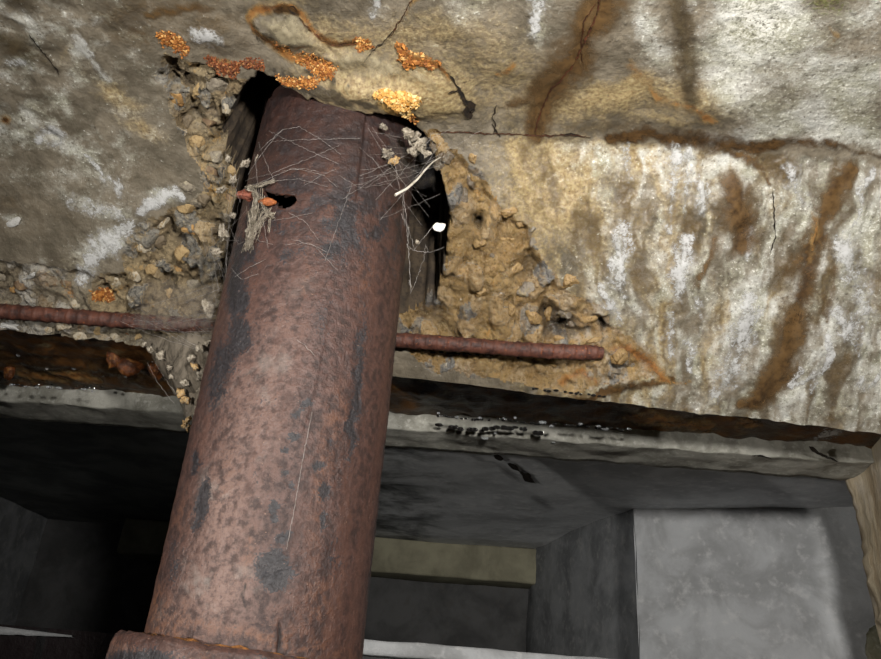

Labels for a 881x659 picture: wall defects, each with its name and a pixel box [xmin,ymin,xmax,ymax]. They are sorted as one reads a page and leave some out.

corrosion [245,2,375,91]
crack [367,0,416,58]
corrosion [394,41,450,80]
crack [436,0,600,138]
corrosion [372,88,422,125]
corrosion [236,189,277,206]
water stain [670,146,711,213]
spalling [395,129,654,396]
water stain [598,220,633,319]
water stain [670,235,694,297]
water stain [834,235,866,282]
water stain [788,286,873,394]